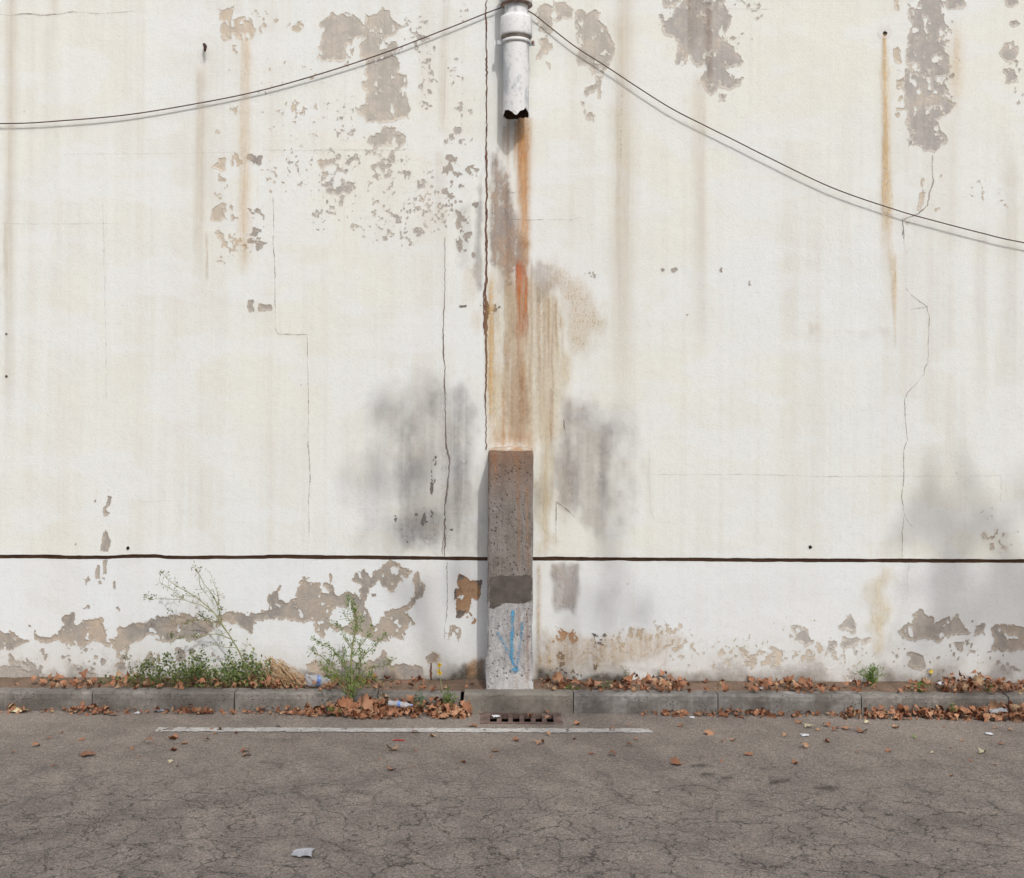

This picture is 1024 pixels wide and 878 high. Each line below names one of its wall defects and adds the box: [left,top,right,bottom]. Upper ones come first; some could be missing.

peeling [210,6,479,266]
corrosion [520,118,528,248]
peeling [535,0,615,122]
peeling [659,0,763,102]
peeling [893,0,967,153]
corrosion [516,262,527,329]
crack [442,237,450,617]
peeling [83,530,116,589]
peeling [0,560,439,680]
spalling [446,573,482,642]
peeling [892,608,1024,676]